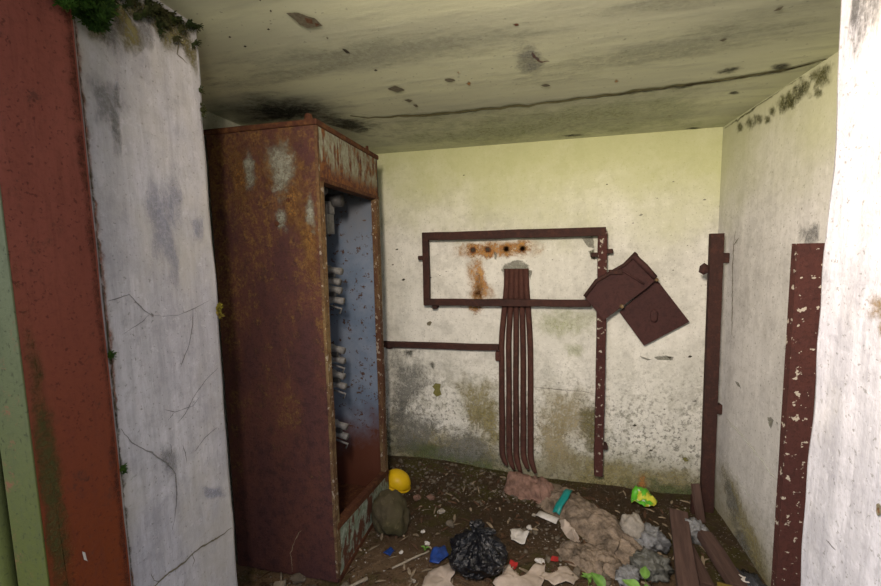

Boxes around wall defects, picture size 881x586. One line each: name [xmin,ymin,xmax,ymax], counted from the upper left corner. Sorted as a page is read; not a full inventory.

spalling [287,12,322,28]
water stain [851,0,878,39]
mould [242,97,367,130]
crack [350,58,828,119]
corrosion [460,241,528,312]
crack [75,32,231,586]
water stain [391,350,499,465]